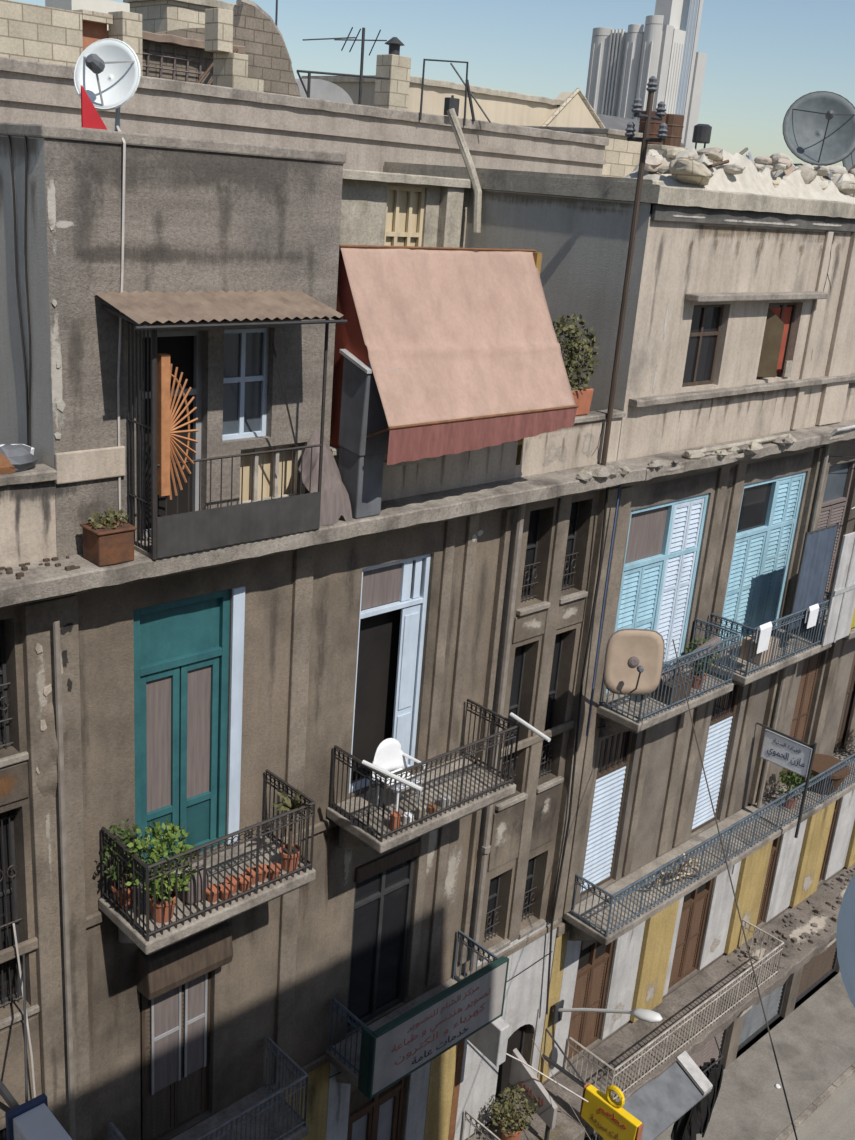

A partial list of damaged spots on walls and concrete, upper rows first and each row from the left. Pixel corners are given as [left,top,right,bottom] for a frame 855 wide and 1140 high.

water stain [0,480,69,529]
peeling [35,642,52,731]
spalling [61,650,72,692]
peeling [426,829,438,875]
peeling [444,850,462,902]